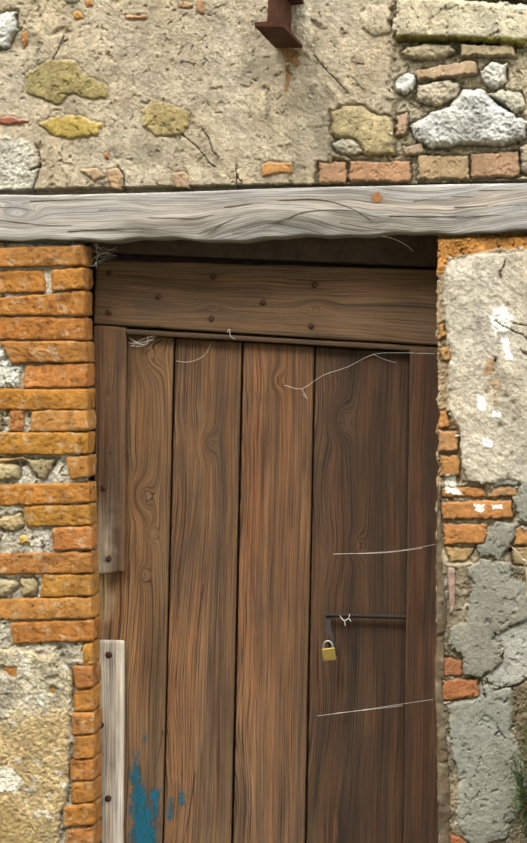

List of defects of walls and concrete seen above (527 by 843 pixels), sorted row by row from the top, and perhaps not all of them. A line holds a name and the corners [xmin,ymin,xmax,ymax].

spalling [330,38,527,186]
spalling [435,232,527,567]